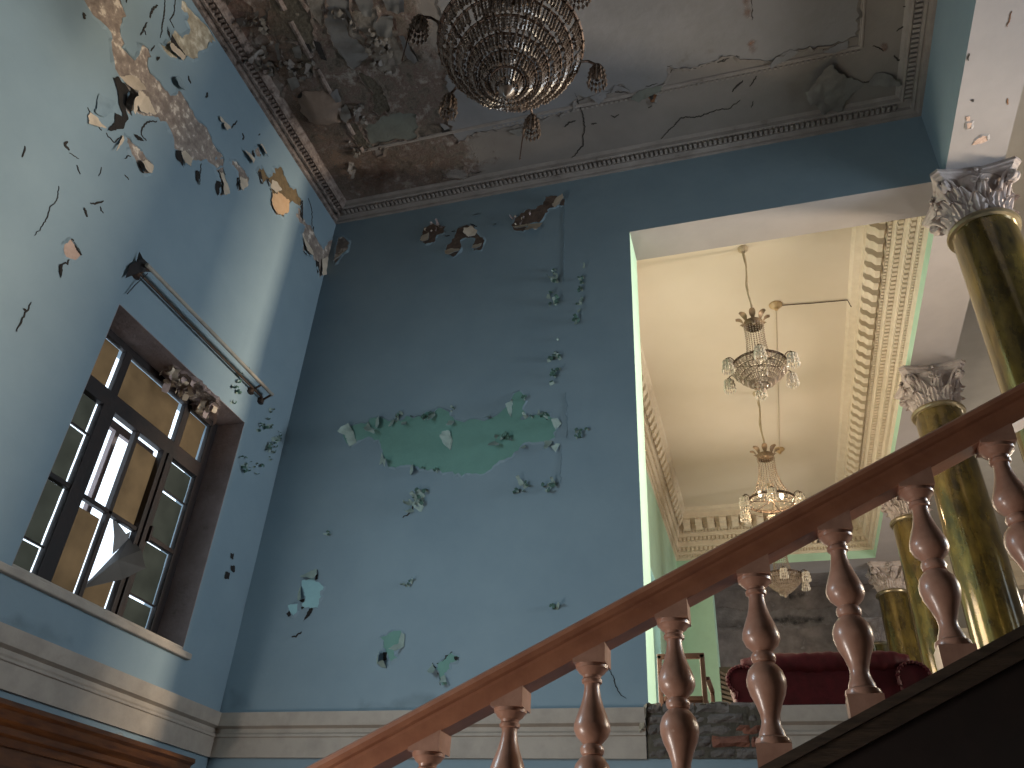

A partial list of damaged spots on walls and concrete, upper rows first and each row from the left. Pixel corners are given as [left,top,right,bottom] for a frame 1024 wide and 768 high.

peeling [82,0,351,279]
flaking render [226,0,421,179]
crack [564,92,619,157]
crack [661,76,757,139]
peeling [59,237,82,277]
crack [35,141,129,235]
peeling [419,213,486,258]
peeling [509,194,566,233]
crack [16,302,32,331]
peeling [338,390,562,478]
peeling [286,569,326,637]
peeling [427,652,461,688]